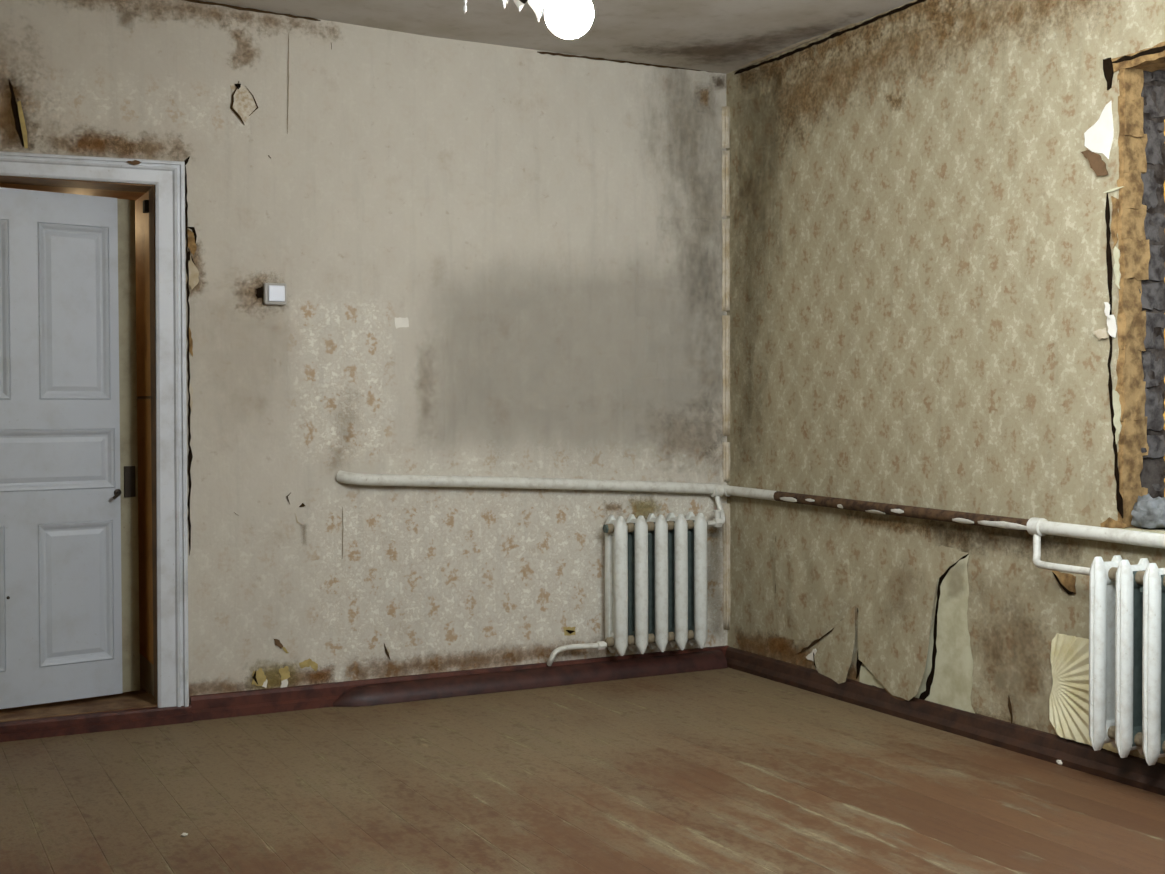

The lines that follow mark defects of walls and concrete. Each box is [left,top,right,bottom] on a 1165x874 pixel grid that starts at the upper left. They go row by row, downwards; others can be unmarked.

water stain [776,0,1090,125]
water stain [55,135,181,157]
spalling [1081,41,1165,534]
peeling [797,546,975,713]
peeling [252,639,318,688]
water stain [279,669,332,687]
water stain [351,648,576,679]